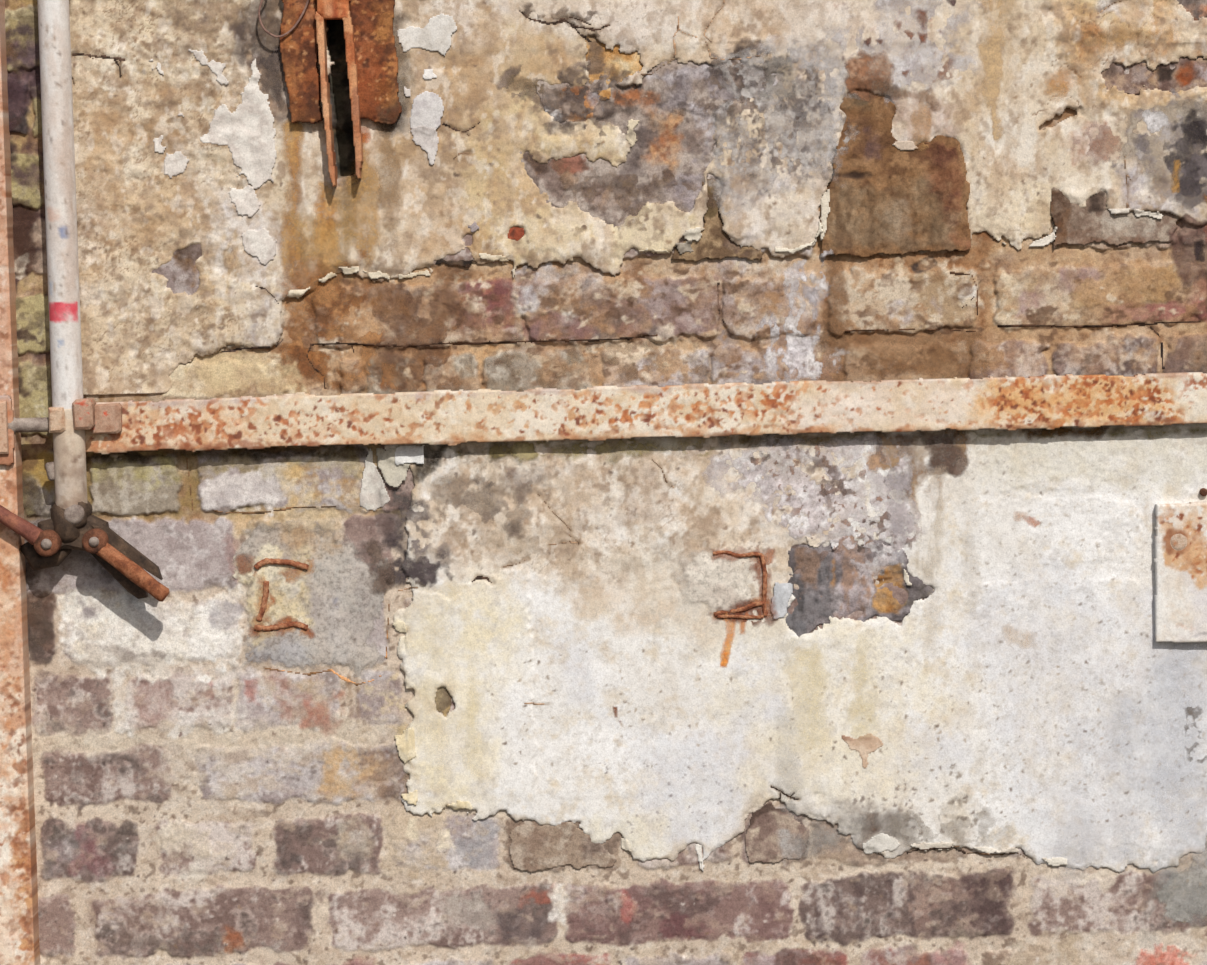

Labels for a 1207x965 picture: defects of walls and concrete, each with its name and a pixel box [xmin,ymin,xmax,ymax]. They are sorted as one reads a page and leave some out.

damp [384,77,406,132]
spalling [1101,57,1207,94]
peeling [200,59,277,265]
spalling [519,35,971,262]
spalling [1029,187,1180,249]
damp [282,272,466,389]
peeling [360,445,425,511]
rust [254,581,314,638]
rust [717,549,775,667]
spalling [770,533,934,637]
spalling [435,687,452,717]
spalling [509,822,631,873]